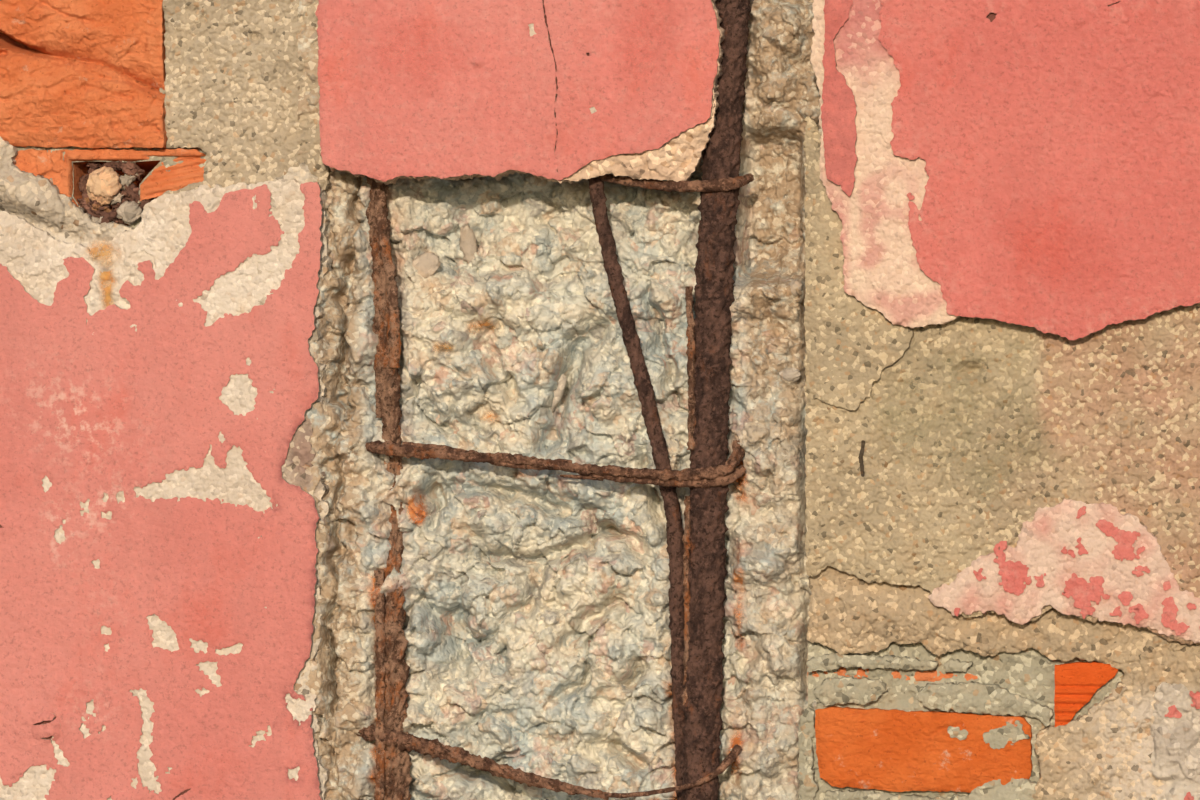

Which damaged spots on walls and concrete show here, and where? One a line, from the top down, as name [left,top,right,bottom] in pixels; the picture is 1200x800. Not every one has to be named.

crack [543,0,558,172]
peeling [0,137,305,327]
peeling [80,432,278,519]
rust [370,569,387,800]
rust [372,179,402,418]
rust [408,495,426,524]
spalling [386,99,719,800]
rust [668,496,691,705]
rust [685,286,696,450]
spalling [718,483,735,800]
peeling [803,0,960,411]
peeling [928,499,1200,643]